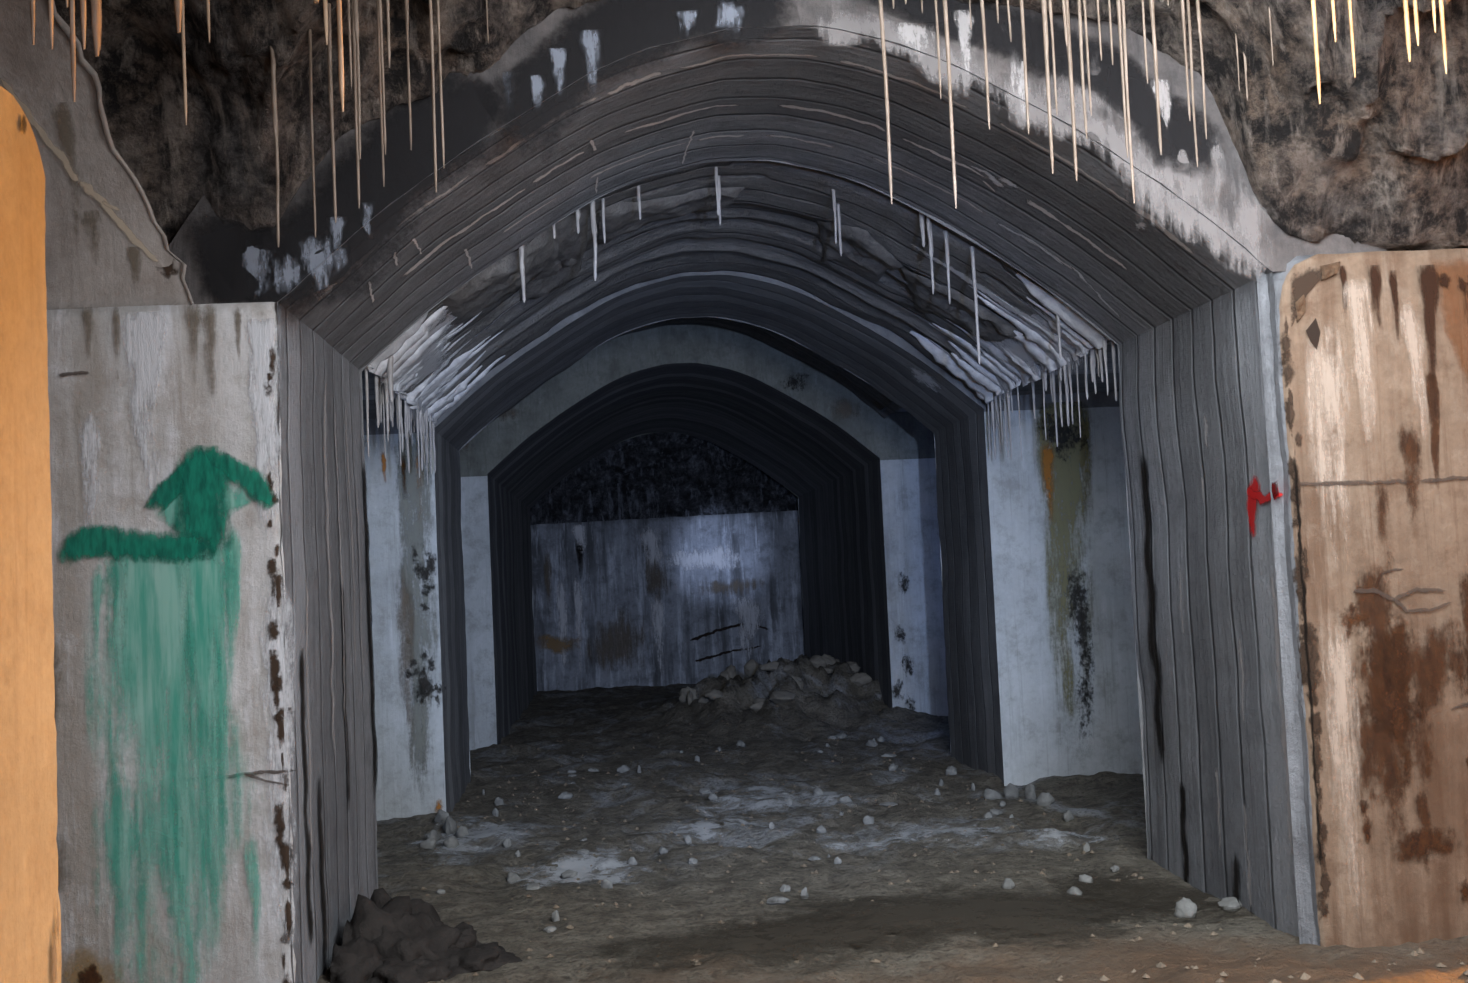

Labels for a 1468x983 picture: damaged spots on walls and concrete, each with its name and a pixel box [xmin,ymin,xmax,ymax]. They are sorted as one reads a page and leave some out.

water stain [188,309,216,389]
corrosion [1342,569,1468,861]
corrosion [1460,882,1468,901]